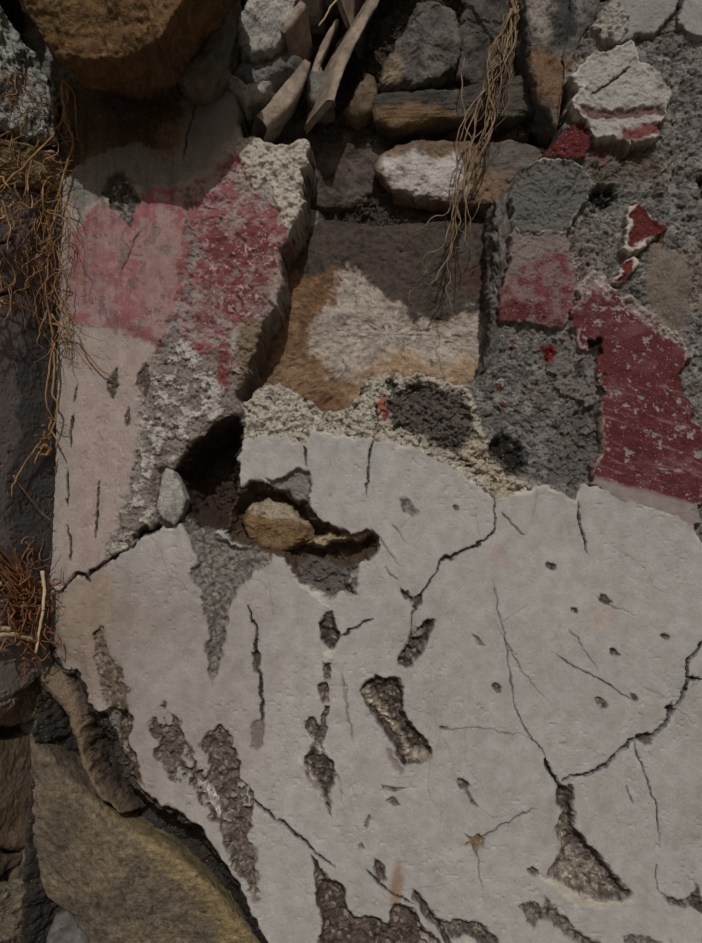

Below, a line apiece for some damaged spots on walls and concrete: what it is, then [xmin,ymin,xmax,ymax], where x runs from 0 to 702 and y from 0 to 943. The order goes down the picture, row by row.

peeling [497,158,702,507]
spalling [93,626,145,787]
spalling [149,701,261,904]
crack [248,605,266,727]
crack [253,796,336,869]
spalling [175,372,532,686]
crack [341,618,375,638]
spalling [360,619,436,766]
crack [400,496,497,630]
crack [439,580,702,894]
spalling [527,778,633,902]
crack [577,501,589,554]